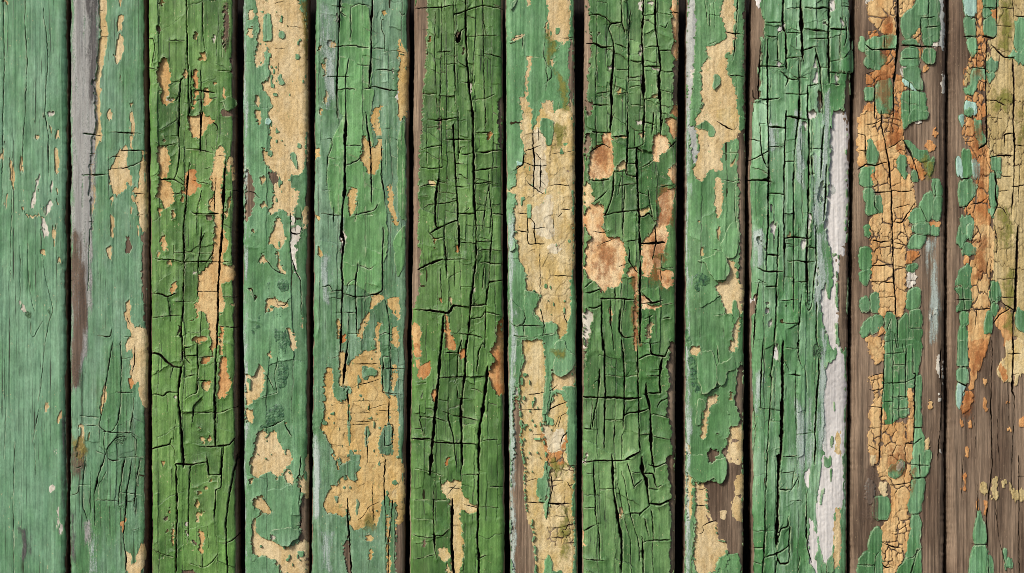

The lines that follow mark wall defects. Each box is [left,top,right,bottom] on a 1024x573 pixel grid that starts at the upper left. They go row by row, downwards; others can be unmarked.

crack [76,7,303,573]
peeling [106,0,336,573]
peeling [320,0,436,573]
crack [327,0,679,573]
peeling [487,0,812,573]
crack [706,0,1024,573]
peeling [802,0,1024,573]